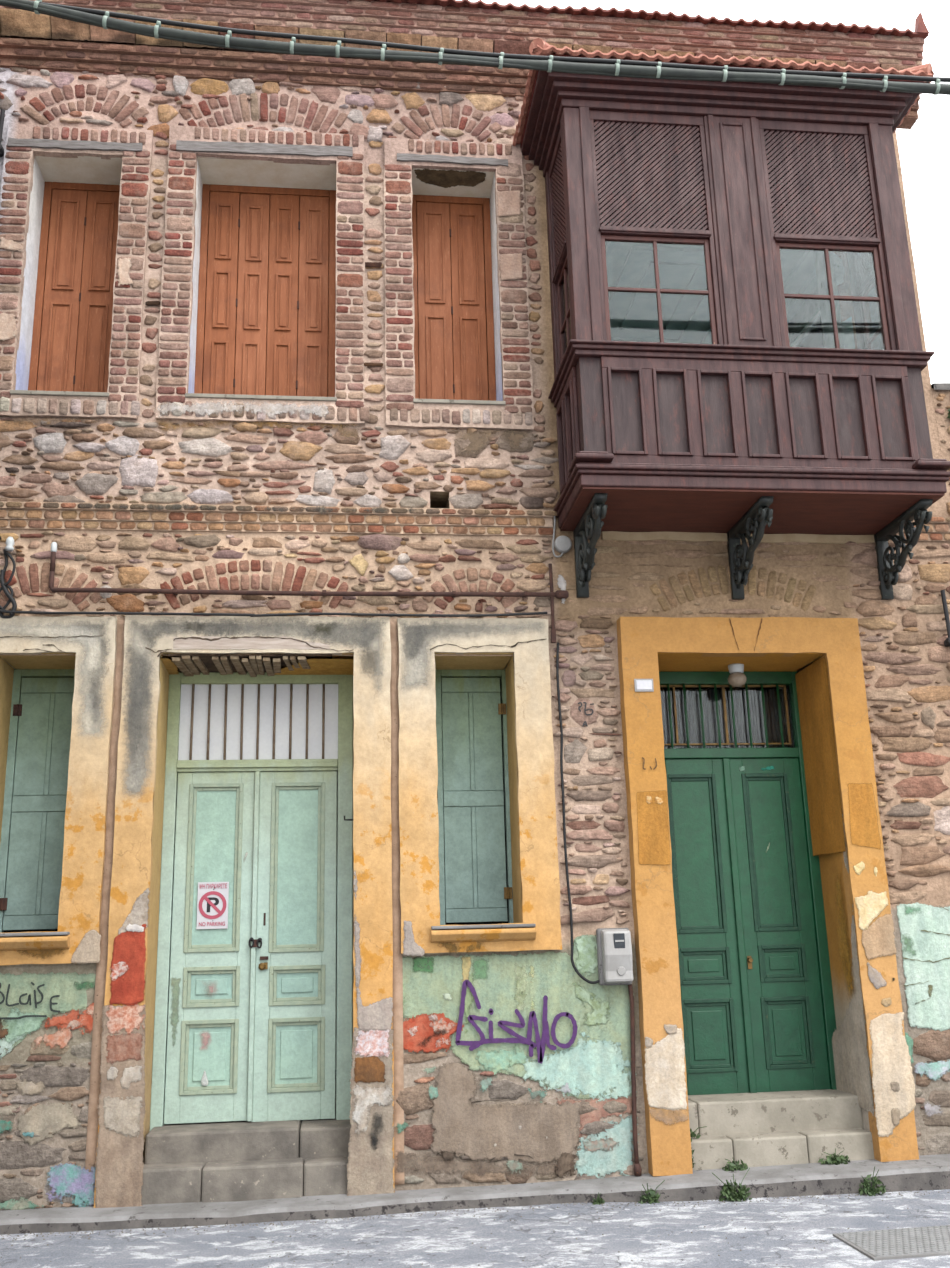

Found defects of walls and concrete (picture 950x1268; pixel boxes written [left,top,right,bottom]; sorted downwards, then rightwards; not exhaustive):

crack [0,635,103,653]
water stain [0,623,105,735]
water stain [125,621,382,794]
water stain [402,623,542,687]
peeling [842,811,878,876]
peeling [0,888,150,1210]
peeling [346,917,688,1196]
peeling [832,891,950,1137]